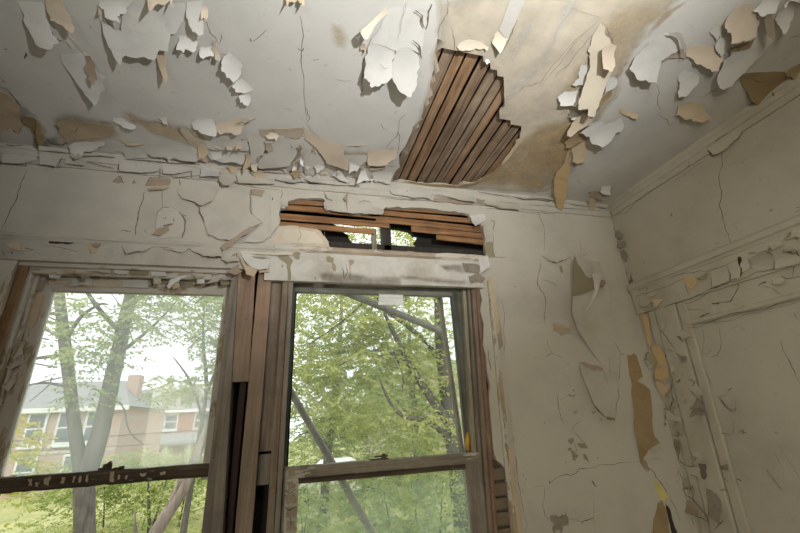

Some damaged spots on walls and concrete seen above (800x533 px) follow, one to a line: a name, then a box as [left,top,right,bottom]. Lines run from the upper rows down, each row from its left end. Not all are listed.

crack [1,145,360,229]
flaking render [0,0,800,349]
leakage [488,120,575,187]
crack [437,181,658,428]
crack [510,9,616,96]
crack [634,155,800,387]
crack [492,437,638,531]
peeling [627,313,742,533]